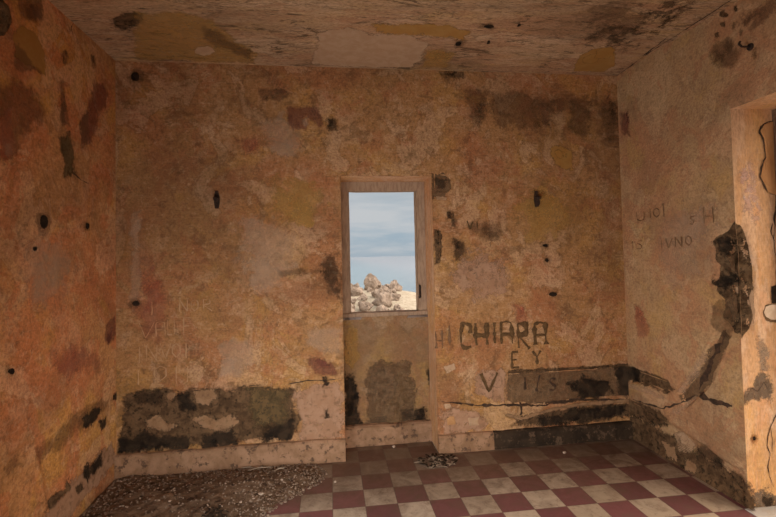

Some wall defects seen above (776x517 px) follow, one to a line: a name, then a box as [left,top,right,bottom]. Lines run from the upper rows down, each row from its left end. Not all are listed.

damp [59,131,87,183]
crack [768,201,776,255]
spalling [711,222,776,338]
damp [344,328,428,426]
spalling [442,363,675,409]
crack [633,330,732,409]
damp [744,336,773,405]
crack [767,415,776,487]